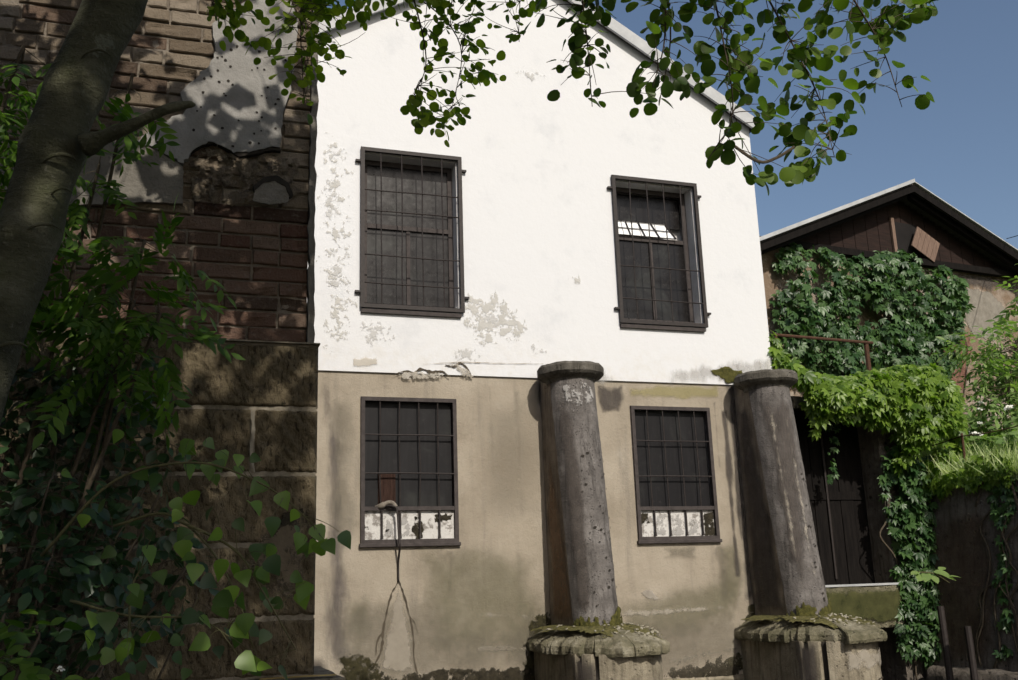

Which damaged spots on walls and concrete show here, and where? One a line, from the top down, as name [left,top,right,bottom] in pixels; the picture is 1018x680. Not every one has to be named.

spalling [188,142,300,208]
peeling [316,142,395,349]
peeling [394,292,528,379]
peeling [563,383,594,411]